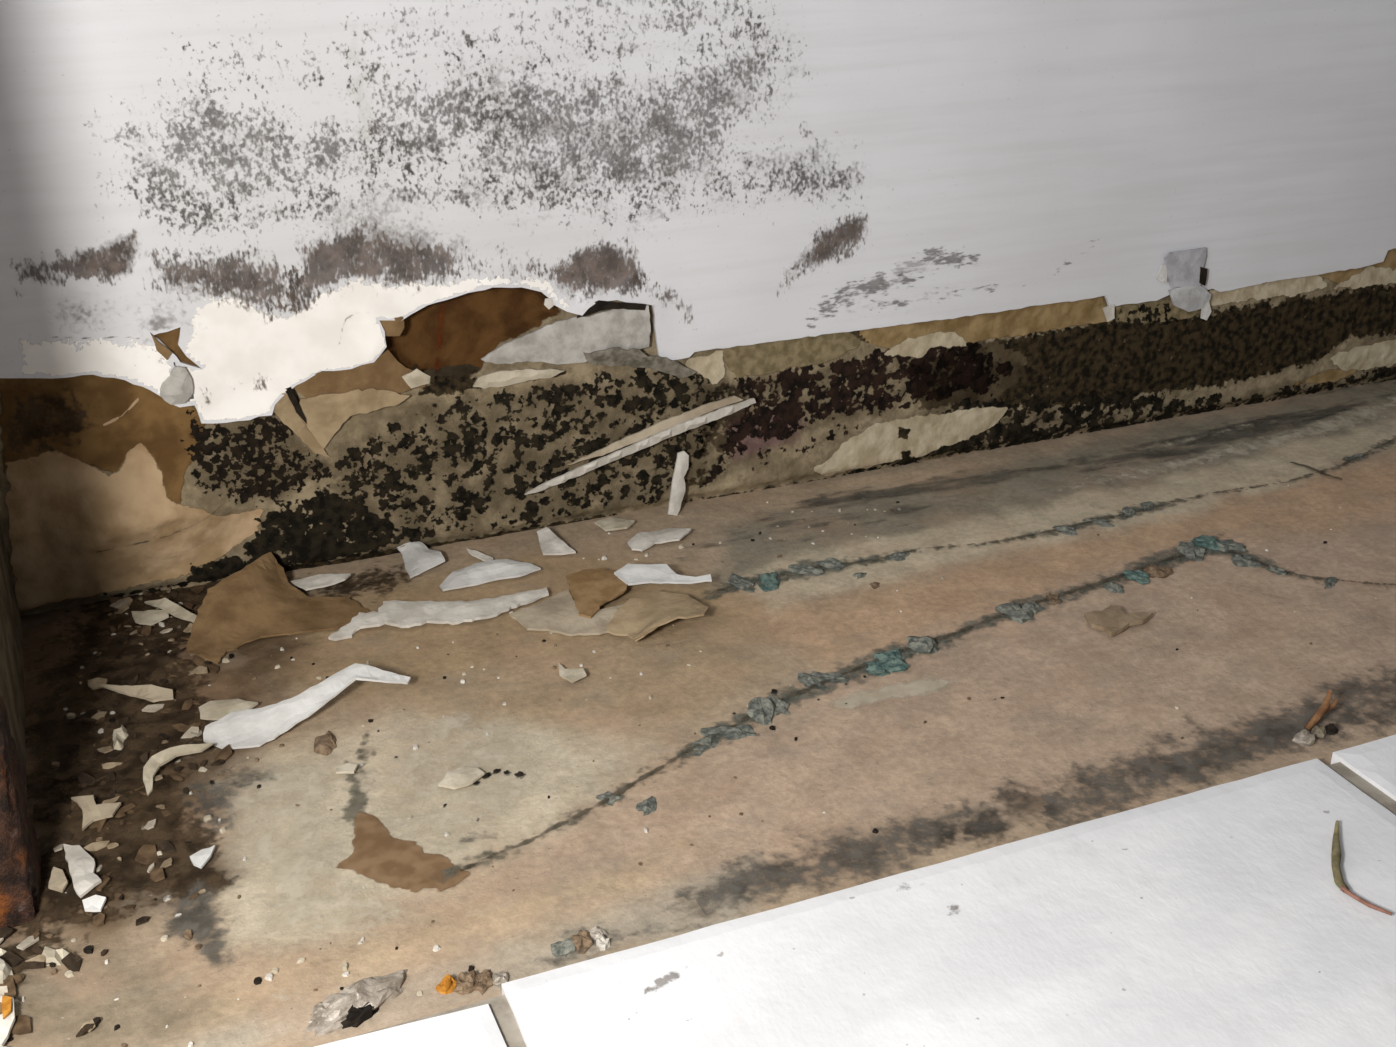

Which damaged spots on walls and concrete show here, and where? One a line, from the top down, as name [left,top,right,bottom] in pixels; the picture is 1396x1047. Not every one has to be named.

water stain [124,0,788,228]
water stain [15,231,136,295]
water stain [152,223,491,321]
water stain [501,239,693,319]
peeling [1102,305,1115,322]
peeling [1155,247,1396,320]
spalling [0,275,576,612]
peeling [524,350,756,495]
peeling [614,528,712,585]
crack [704,436,1396,600]
water stain [0,284,1396,987]
crack [460,534,1396,871]